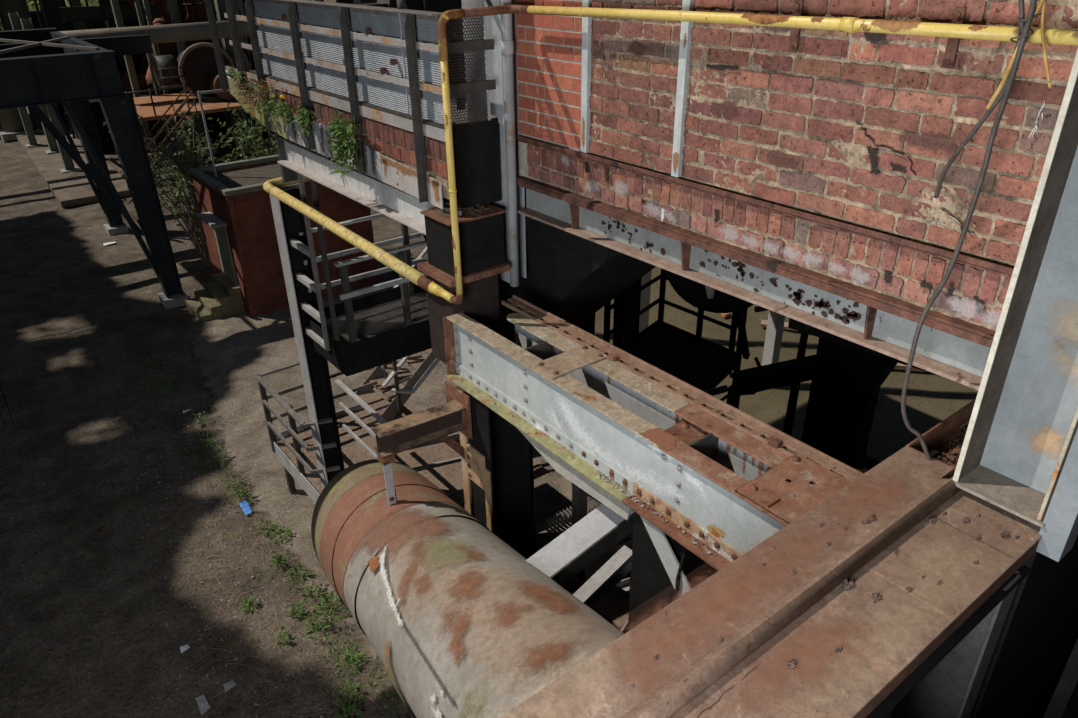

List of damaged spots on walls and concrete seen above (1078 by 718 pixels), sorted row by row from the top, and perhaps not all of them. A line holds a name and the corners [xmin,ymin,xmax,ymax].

corrosion [742,13,795,25]
corrosion [872,19,921,32]
leakage [647,203,674,222]
leakage [723,228,867,284]
leakage [950,298,1000,325]
corrosion [639,415,685,451]
corrosion [726,443,771,475]
corrosion [597,469,716,555]
corrosion [707,524,724,538]
peeling [353,509,450,626]
corrosion [436,571,486,666]
corrosion [492,582,579,626]